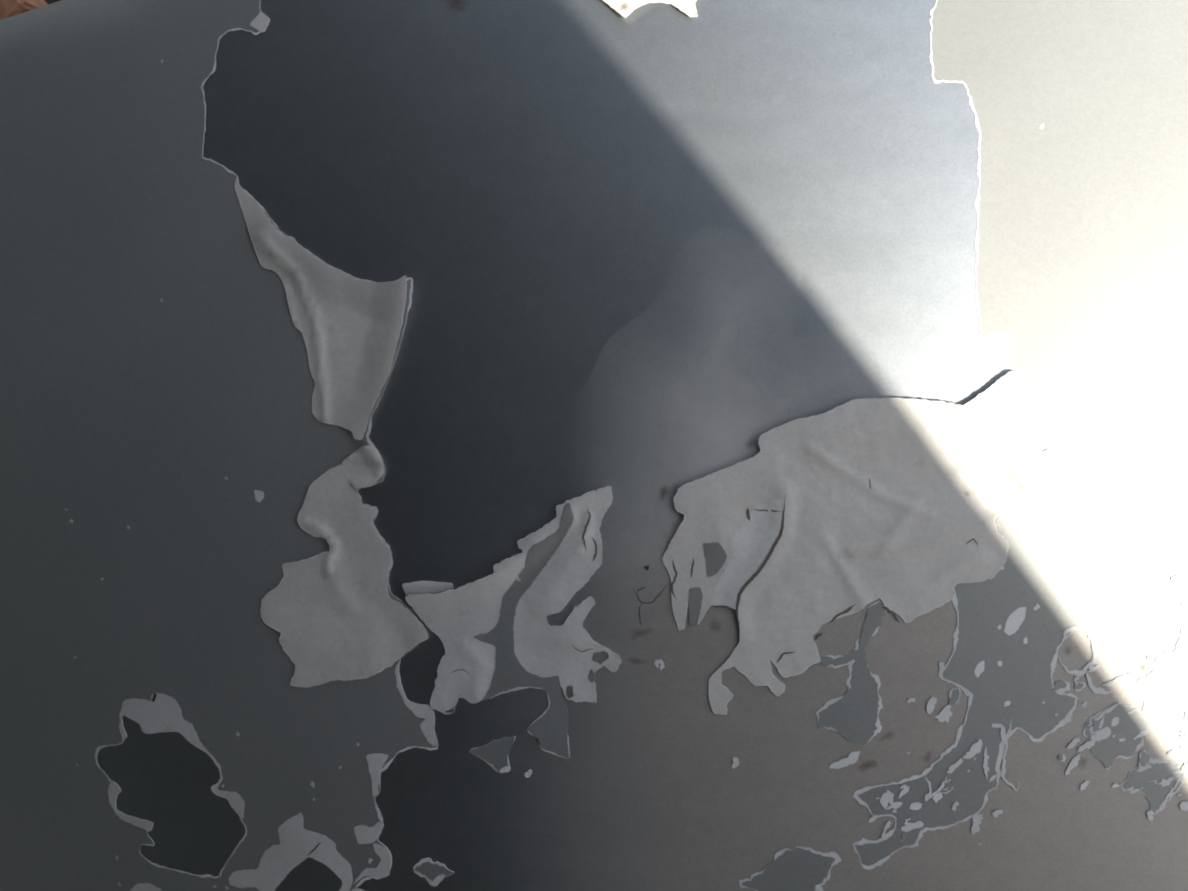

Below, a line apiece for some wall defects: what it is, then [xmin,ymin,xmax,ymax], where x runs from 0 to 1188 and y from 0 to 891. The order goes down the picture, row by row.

peeling [201,0,1066,758]
peeling [95,693,247,888]
peeling [229,813,353,891]
peeling [351,507,1188,891]